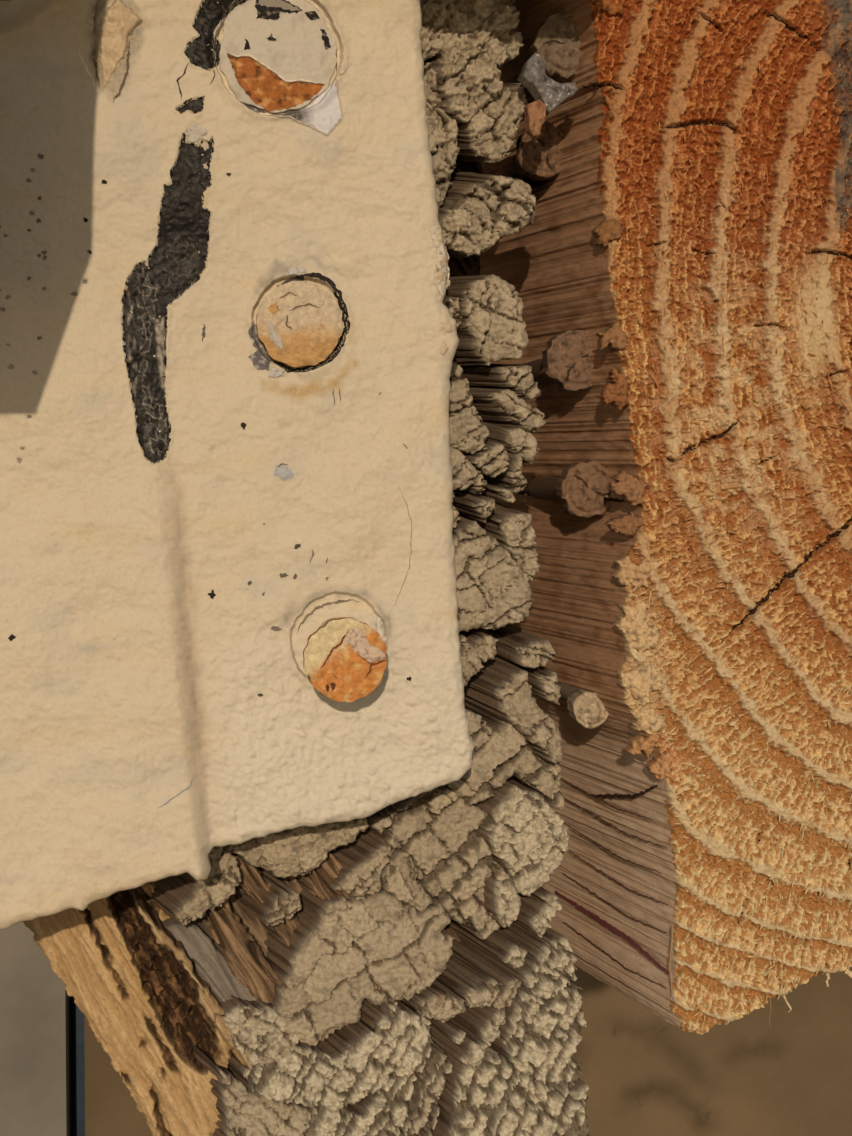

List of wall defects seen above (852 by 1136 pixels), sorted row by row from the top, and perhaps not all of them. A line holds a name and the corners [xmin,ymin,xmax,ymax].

peeling [121,0,349,464]
corrosion [227,53,325,111]